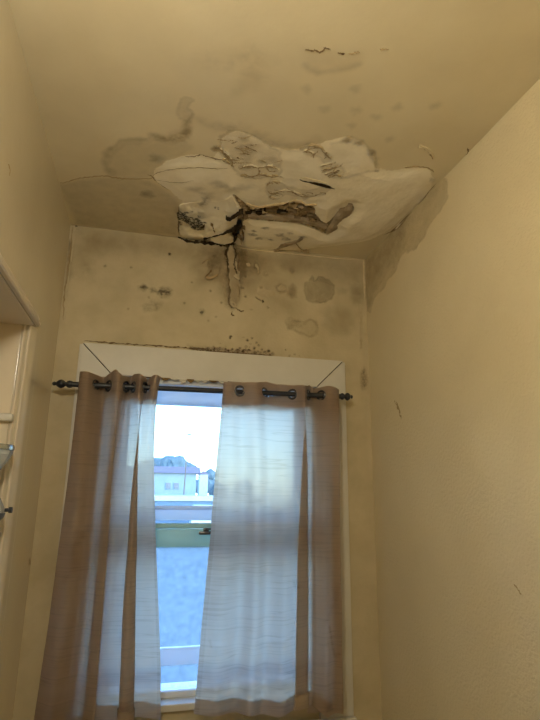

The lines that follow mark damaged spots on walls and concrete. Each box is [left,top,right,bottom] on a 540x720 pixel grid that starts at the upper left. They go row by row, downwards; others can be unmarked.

water stain [177,211,206,230]
crack [178,210,365,349]
flaking render [149,131,434,253]
water stain [86,339,272,356]